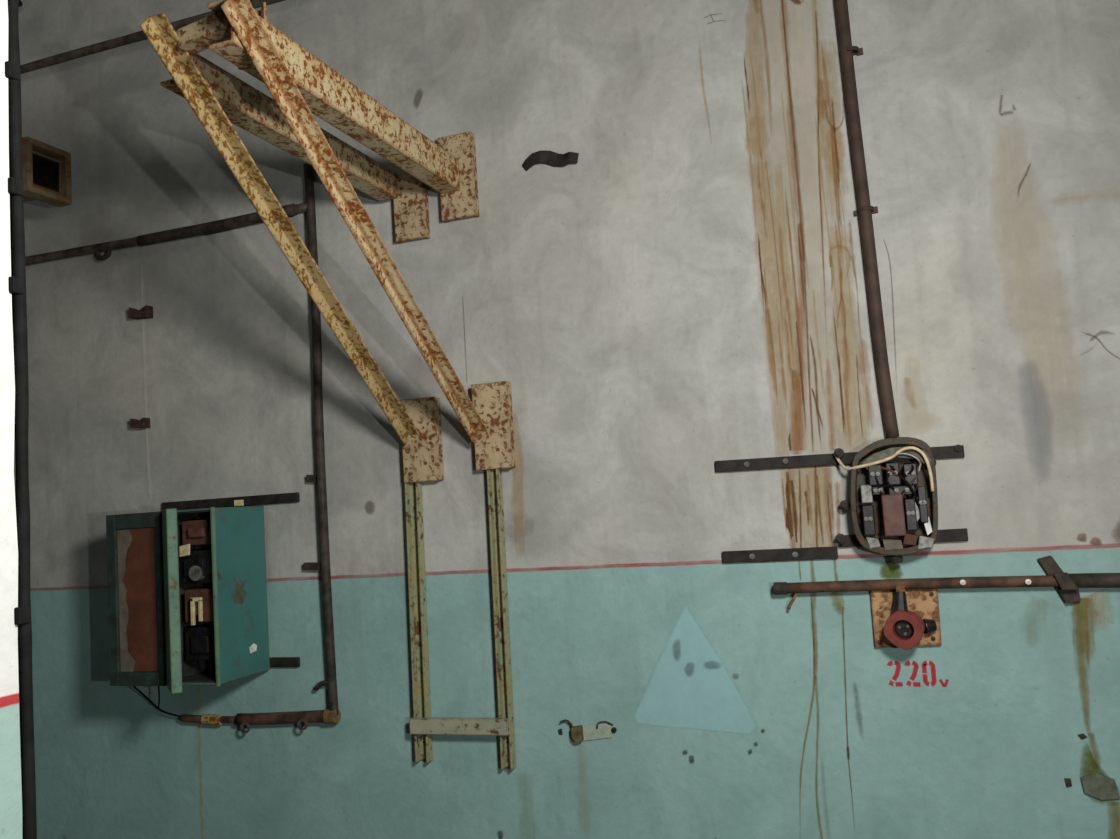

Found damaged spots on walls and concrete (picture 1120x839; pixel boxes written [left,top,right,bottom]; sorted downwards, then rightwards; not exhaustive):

corrosion [782,0,859,441]
corrosion [787,466,833,545]